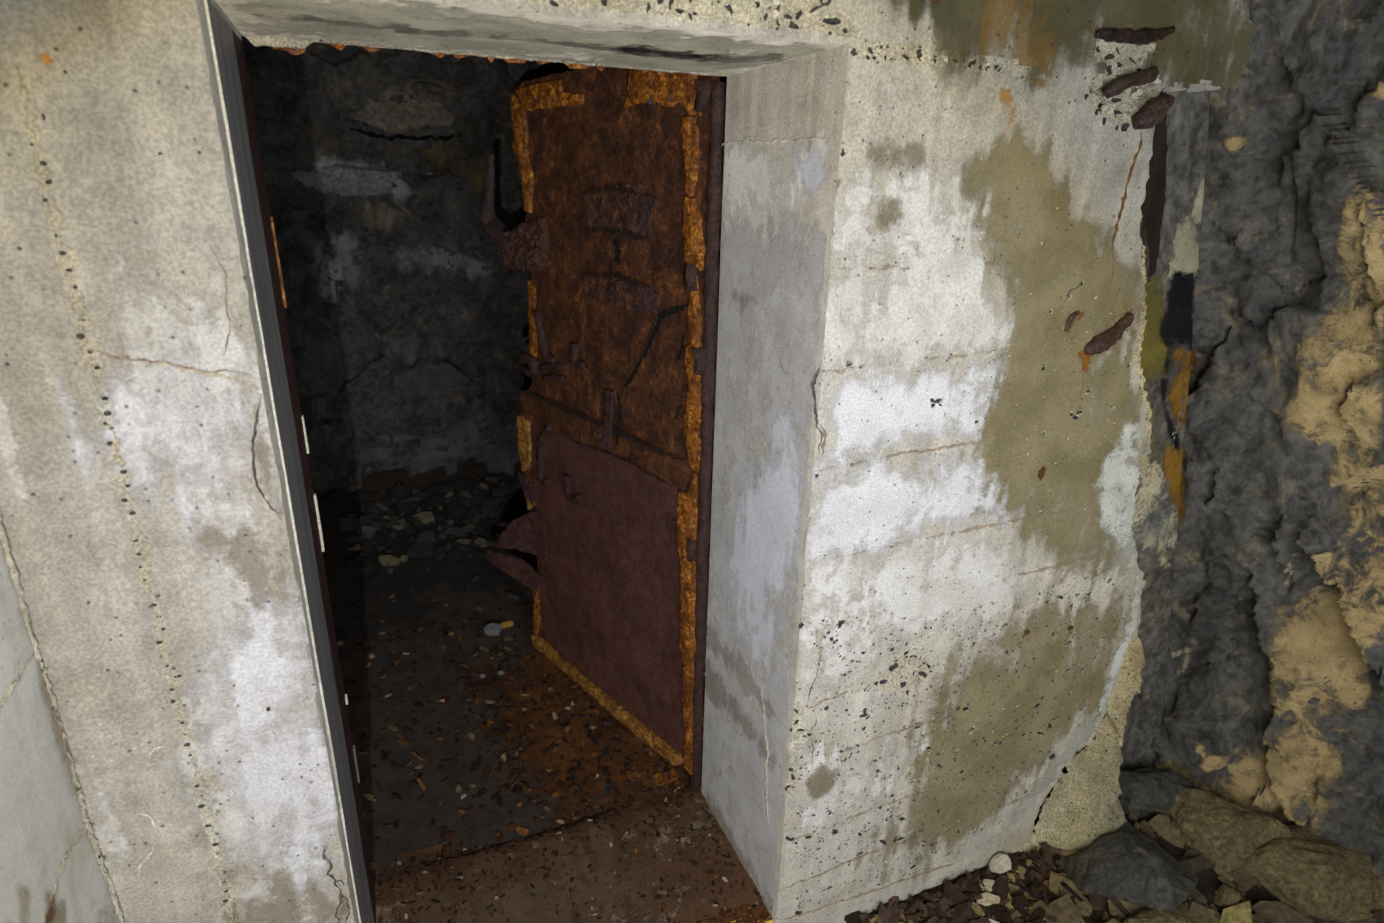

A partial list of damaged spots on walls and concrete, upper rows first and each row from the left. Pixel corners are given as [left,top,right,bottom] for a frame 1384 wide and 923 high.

spalling [1084,26,1175,132]
damp [1224,136,1245,151]
damp [1374,82,1384,99]
spalling [1084,241,1152,444]
damp [702,128,1208,916]
damp [1195,185,1384,828]
spalling [1103,634,1145,747]